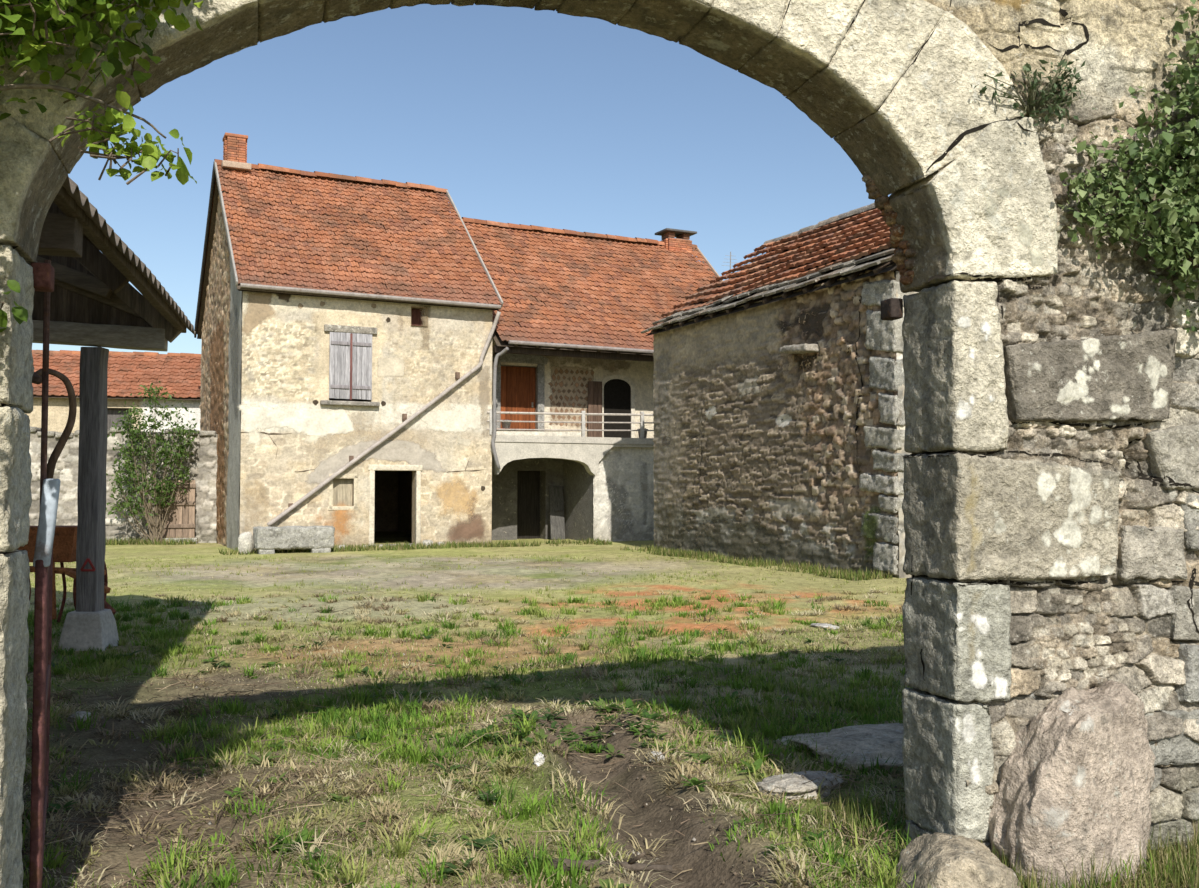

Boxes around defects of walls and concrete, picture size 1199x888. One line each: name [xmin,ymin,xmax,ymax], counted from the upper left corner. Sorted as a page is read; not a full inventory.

crack [987,8,1089,72]
crack [926,116,1033,172]